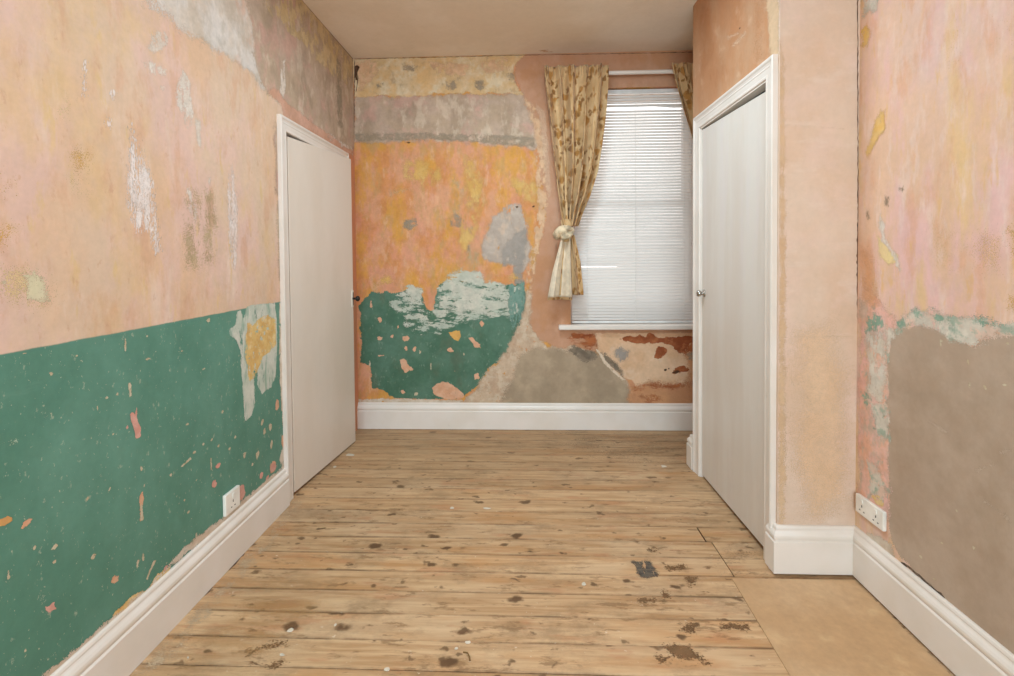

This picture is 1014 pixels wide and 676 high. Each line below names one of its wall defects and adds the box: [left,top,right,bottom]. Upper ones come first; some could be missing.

peeling [229,125,284,480]
peeling [141,0,549,400]
peeling [856,294,1014,519]